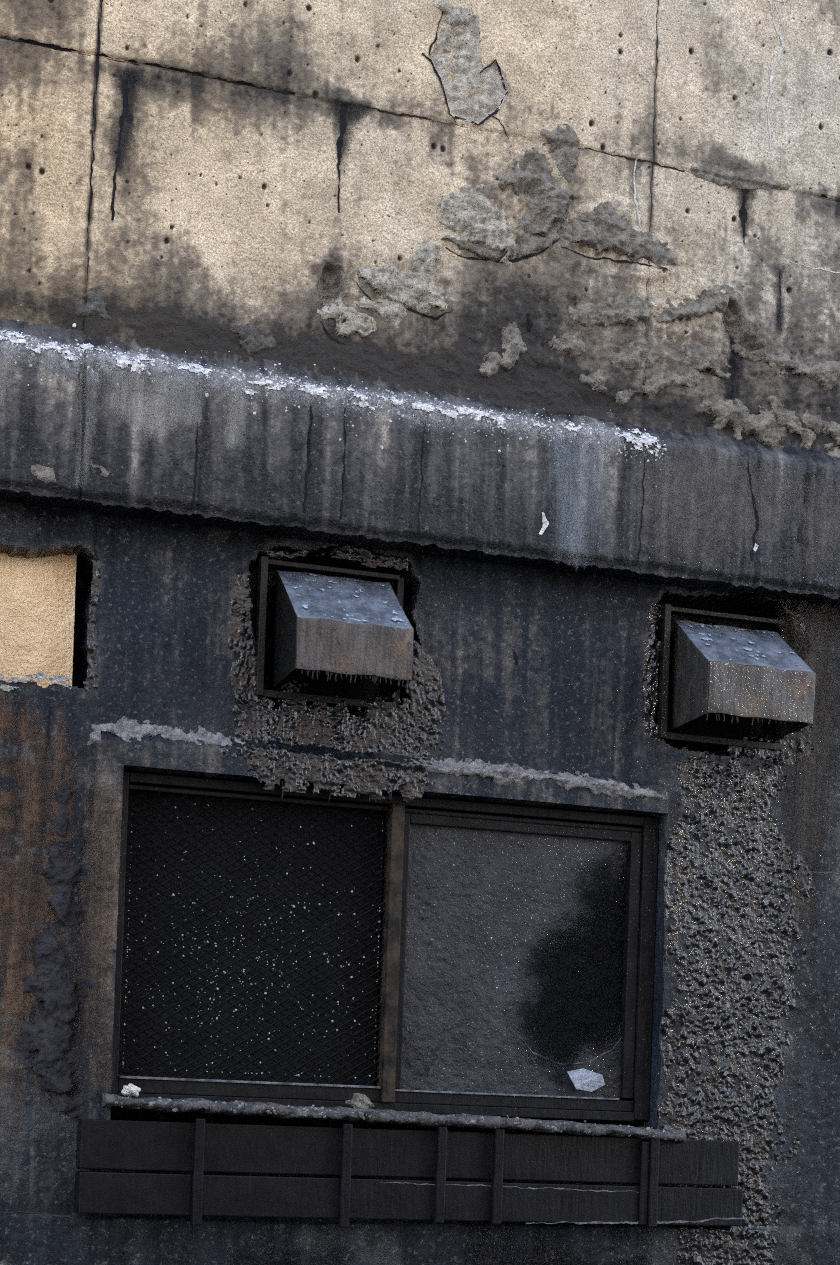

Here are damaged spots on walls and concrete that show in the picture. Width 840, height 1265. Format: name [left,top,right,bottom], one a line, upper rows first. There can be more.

spalling [422,1,511,139]
spalling [690,164,792,191]
peeling [317,239,448,338]
damp [0,333,631,447]
peeling [0,285,667,470]
crack [747,461,759,561]
spalling [0,671,72,692]
peeling [680,621,799,665]